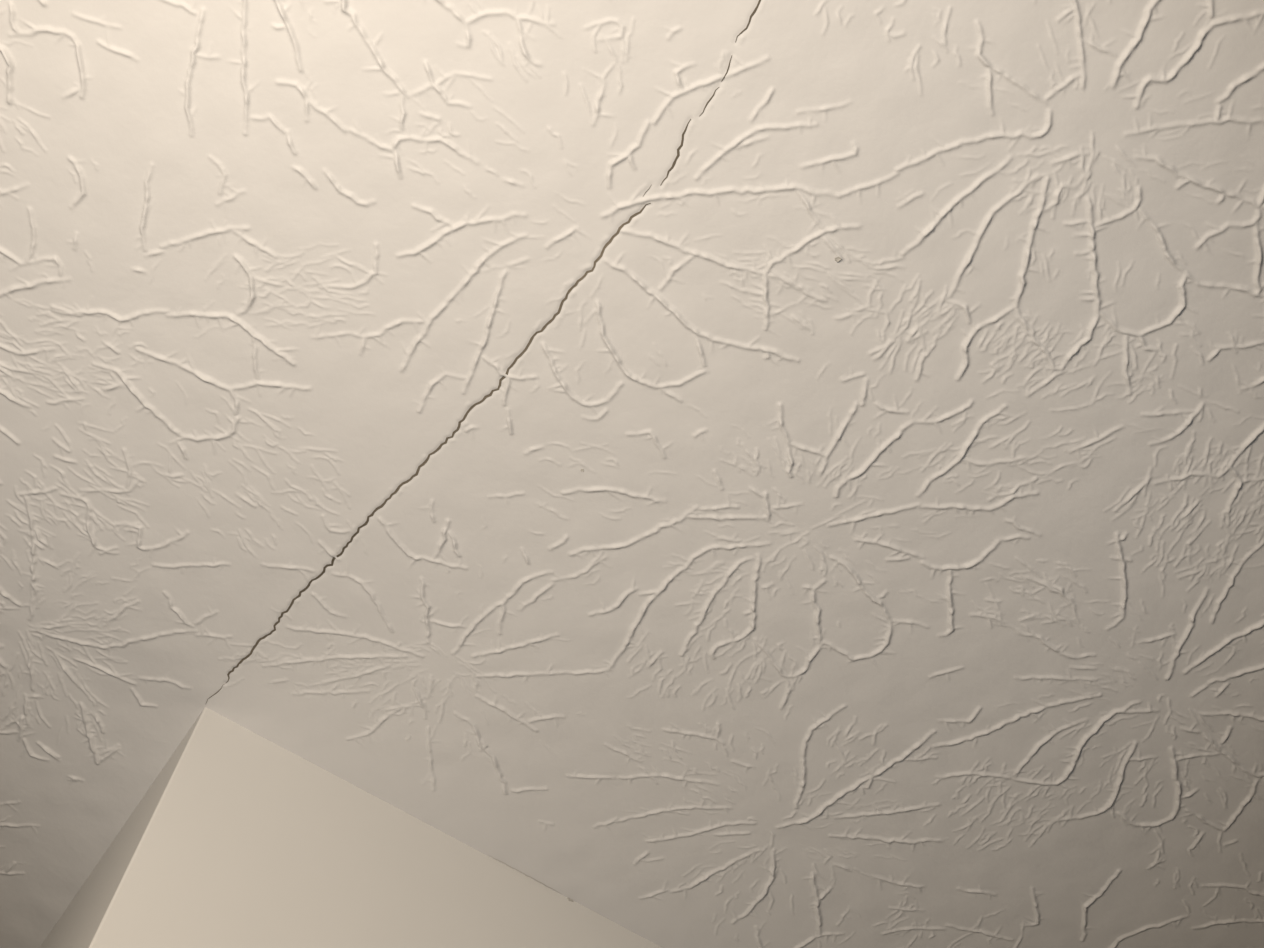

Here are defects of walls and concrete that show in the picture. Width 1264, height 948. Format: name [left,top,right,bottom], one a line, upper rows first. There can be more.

crack [206,0,761,703]